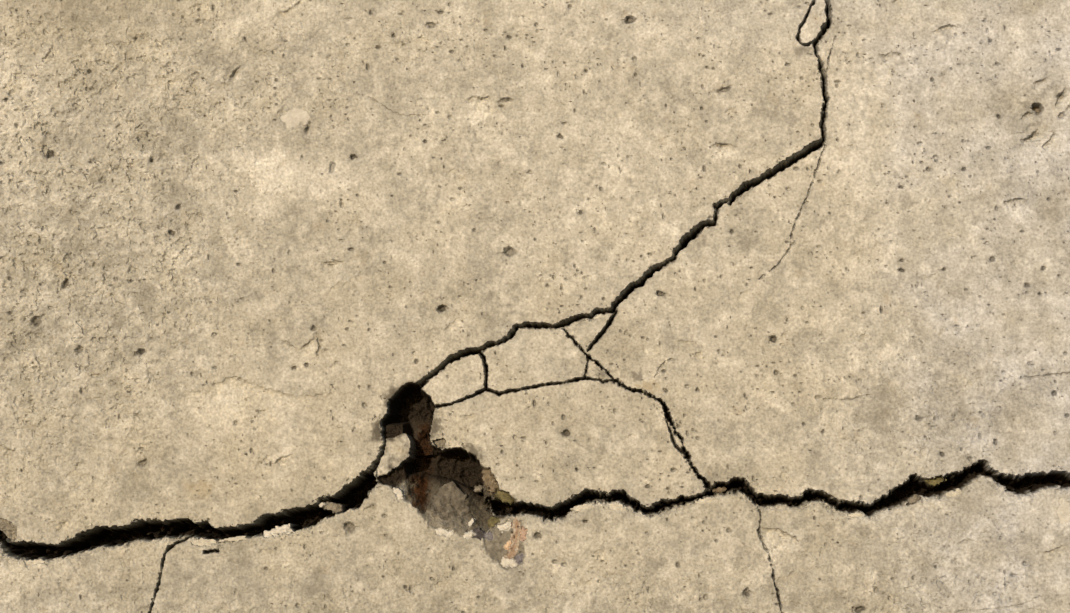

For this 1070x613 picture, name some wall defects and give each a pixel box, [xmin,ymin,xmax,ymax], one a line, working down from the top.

crack [368,96,430,119]
crack [414,0,1070,613]
crack [0,442,386,613]
spalling [380,382,437,442]
corrosion [404,418,441,514]
spalling [374,439,528,573]